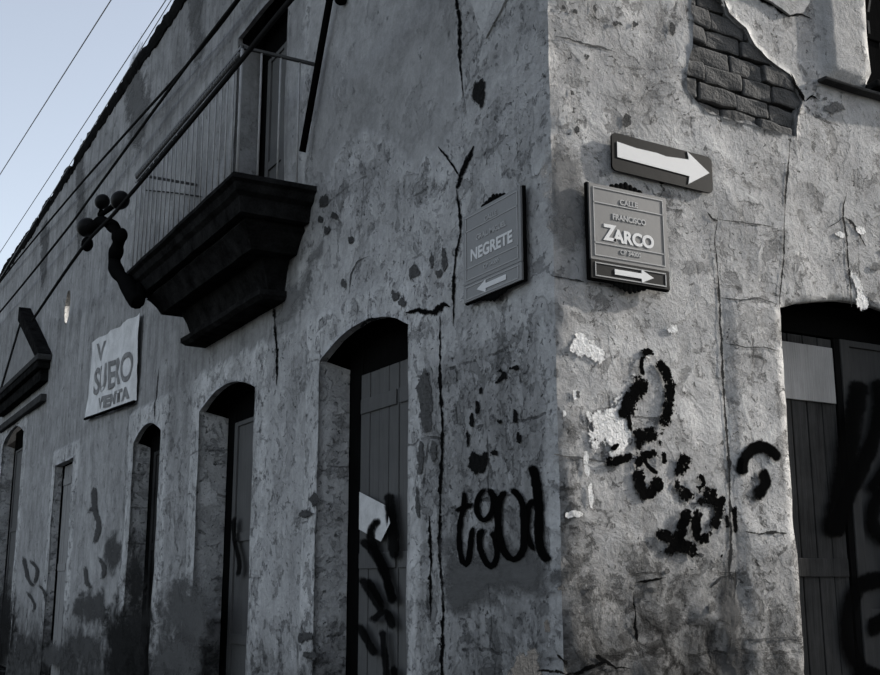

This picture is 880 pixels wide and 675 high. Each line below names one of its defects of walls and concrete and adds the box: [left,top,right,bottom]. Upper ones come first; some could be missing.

crack [454,0,463,93]
flaking render [687,0,801,142]
crack [760,0,810,18]
crack [829,193,880,307]
spalling [570,332,606,364]
crack [707,144,790,590]
leakage [0,528,211,675]
crack [633,577,666,642]
crack [538,654,630,675]